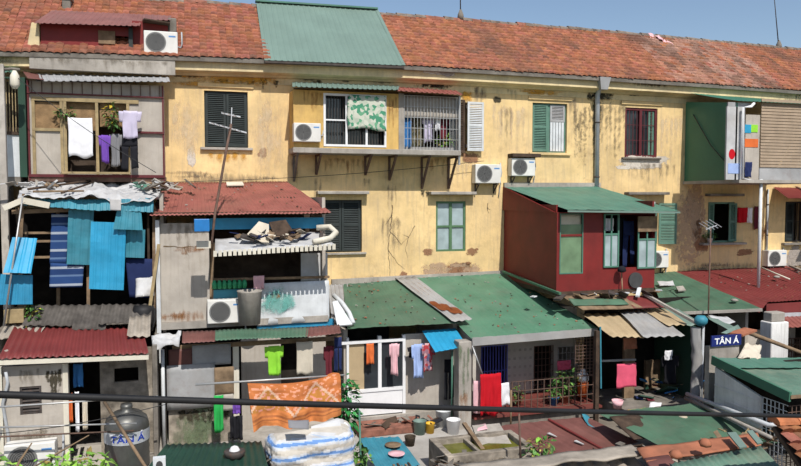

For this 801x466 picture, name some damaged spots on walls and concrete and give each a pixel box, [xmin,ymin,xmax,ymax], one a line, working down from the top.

water stain [574,93,625,146]
crack [385,205,415,275]
flaking render [423,248,479,274]
flaking render [786,245,801,267]
corrosion [429,301,462,313]